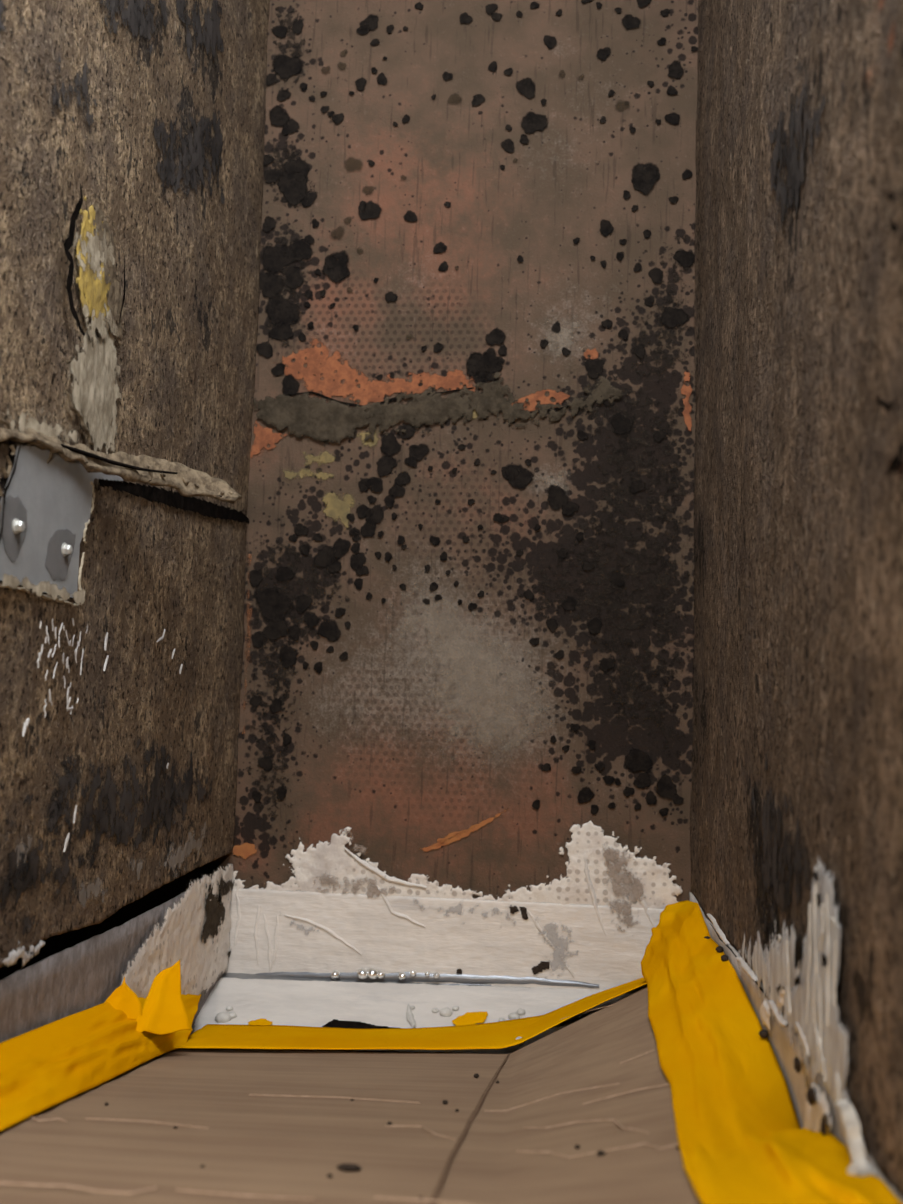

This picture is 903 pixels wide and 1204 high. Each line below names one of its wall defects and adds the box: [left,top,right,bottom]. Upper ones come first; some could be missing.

mould [349,14,408,95]
mould [581,0,670,30]
leakage [153,95,225,204]
mould [256,7,382,396]
mould [488,61,548,170]
crack [64,184,85,336]
crack [118,256,126,324]
mould [433,242,458,271]
leakage [466,328,507,384]
leakage [474,134,701,817]
leakage [245,424,433,825]
leakage [746,756,842,1100]